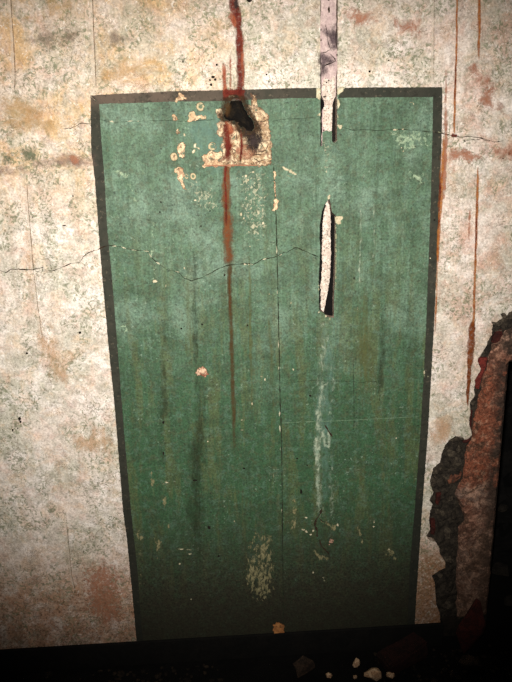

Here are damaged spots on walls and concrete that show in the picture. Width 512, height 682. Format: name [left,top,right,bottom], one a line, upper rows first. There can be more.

corrosion [222,0,245,99]
flaking render [170,93,297,236]
crack [343,127,501,142]
corrosion [437,0,480,264]
corrosion [480,78,494,106]
corrosion [222,123,249,423]
corrosion [466,170,479,404]
crack [0,190,419,625]
damp [314,411,330,510]
flaking render [427,311,512,619]
peeling [246,533,274,601]